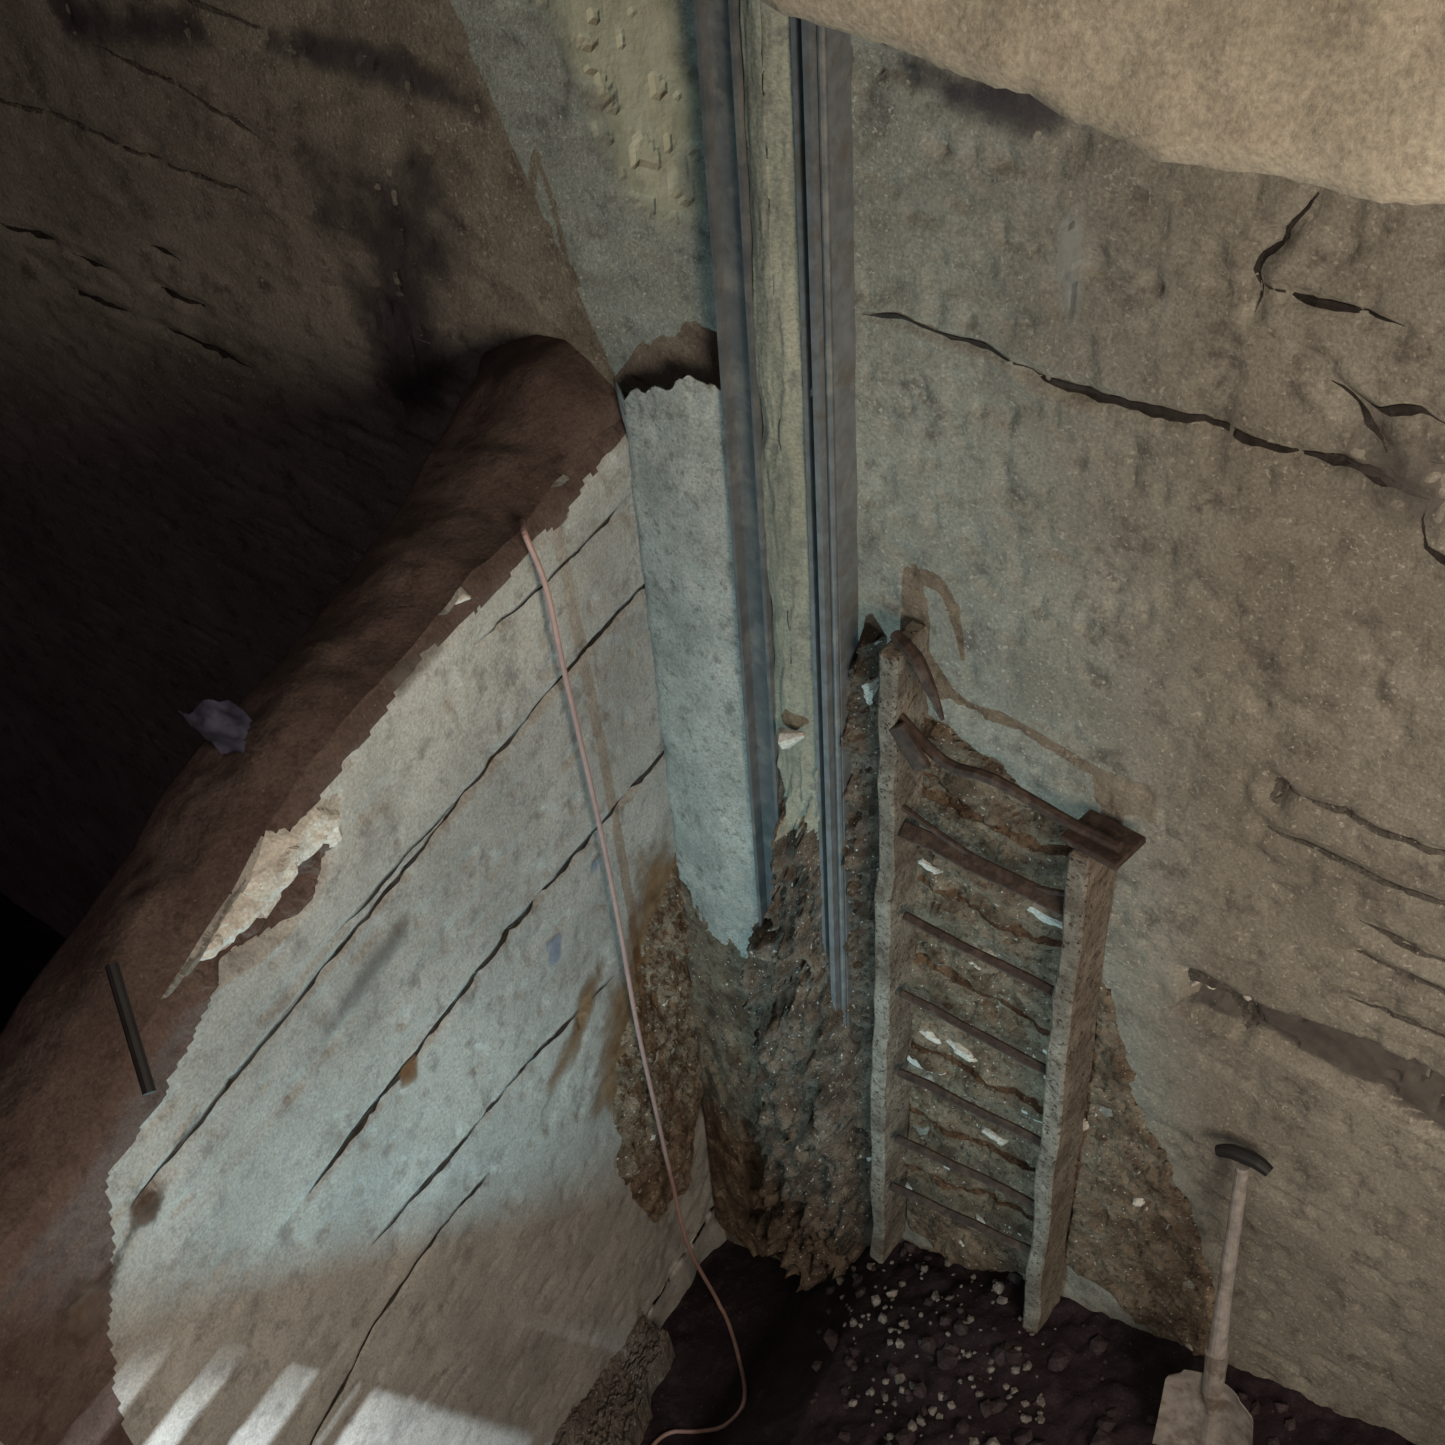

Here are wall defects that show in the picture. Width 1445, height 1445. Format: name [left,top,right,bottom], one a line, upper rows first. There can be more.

water stain [56,0,199,45]
water stain [272,33,477,107]
water stain [351,158,446,406]
crack [1254,193,1406,327]
crack [864,313,1445,566]
spalling [161,807,343,1002]
crack [132,585,664,1244]
spalling [613,854,704,1223]
spalling [841,622,887,1246]
spalling [903,845,1063,1274]
spalling [918,717,1073,890]
spalling [1064,980,1215,1356]